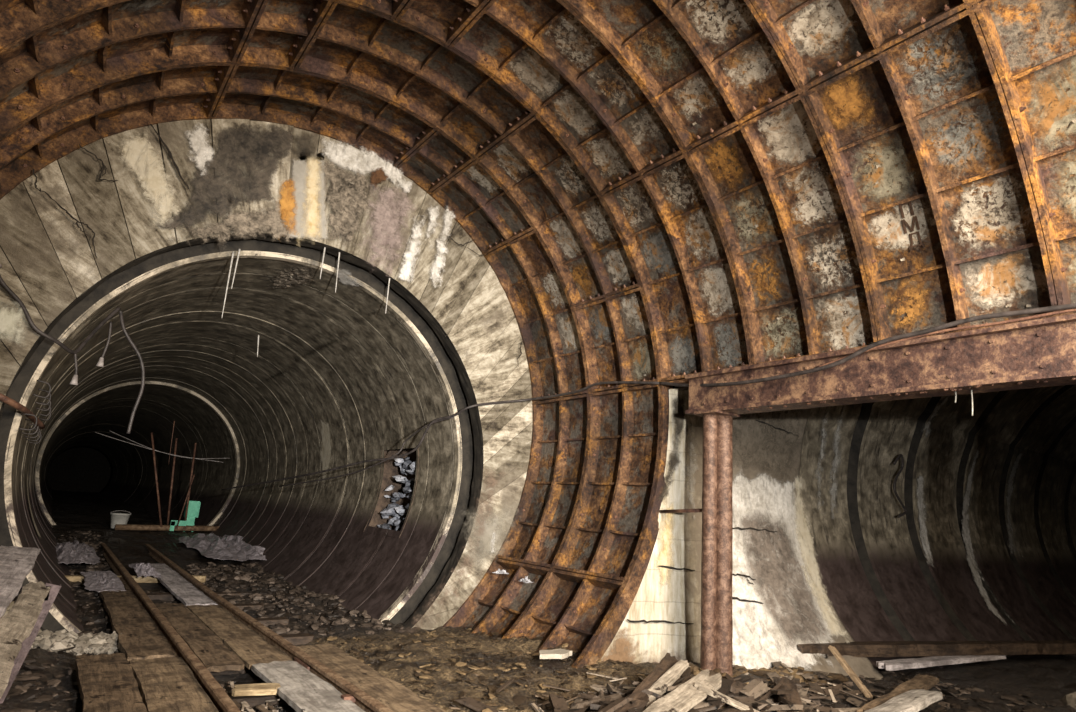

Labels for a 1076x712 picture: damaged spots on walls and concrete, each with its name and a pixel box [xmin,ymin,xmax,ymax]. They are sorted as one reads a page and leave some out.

rust [826,77,873,128]
damp [122,124,455,287]
rust [279,159,320,237]
rust [371,167,388,186]
rust [706,138,744,188]
rust [749,254,782,300]
rust [885,281,930,326]
rust [658,507,673,584]
crack [733,525,777,533]
damp [732,409,846,670]
crack [732,573,764,604]
rust [589,629,639,666]